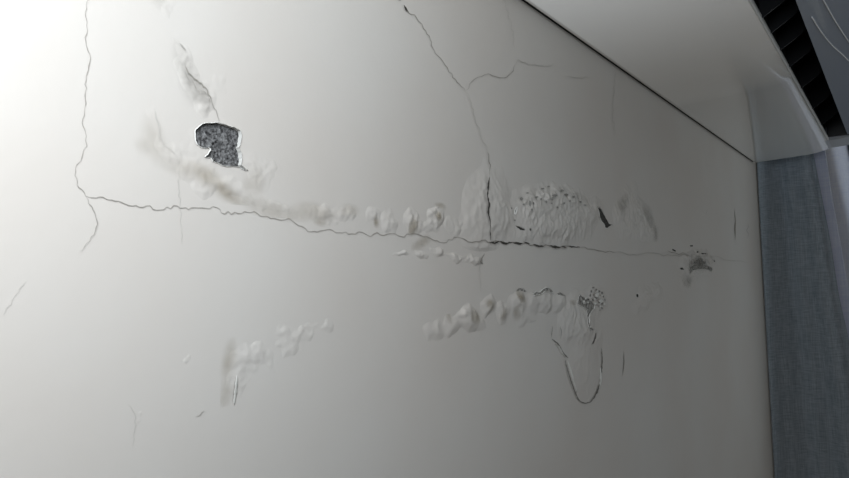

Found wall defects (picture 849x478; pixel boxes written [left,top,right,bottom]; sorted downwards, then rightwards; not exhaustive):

spalling [194,122,248,171]
crack [75,3,743,290]
spalling [680,245,715,274]
spalling [551,287,606,404]